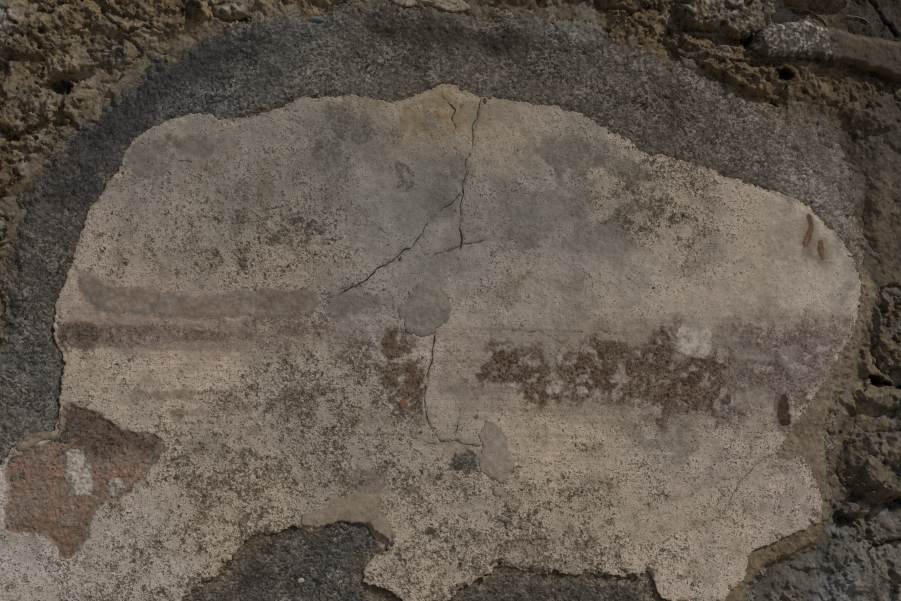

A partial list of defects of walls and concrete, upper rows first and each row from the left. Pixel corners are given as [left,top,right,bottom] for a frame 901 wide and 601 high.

crack [869,0,897,37]
spalling [775,68,792,80]
crack [436,95,484,260]
crack [325,224,427,298]
peeling [57,275,317,351]
spalling [377,328,425,411]
crack [409,335,476,446]
spalling [466,319,850,428]
peeling [4,404,163,558]